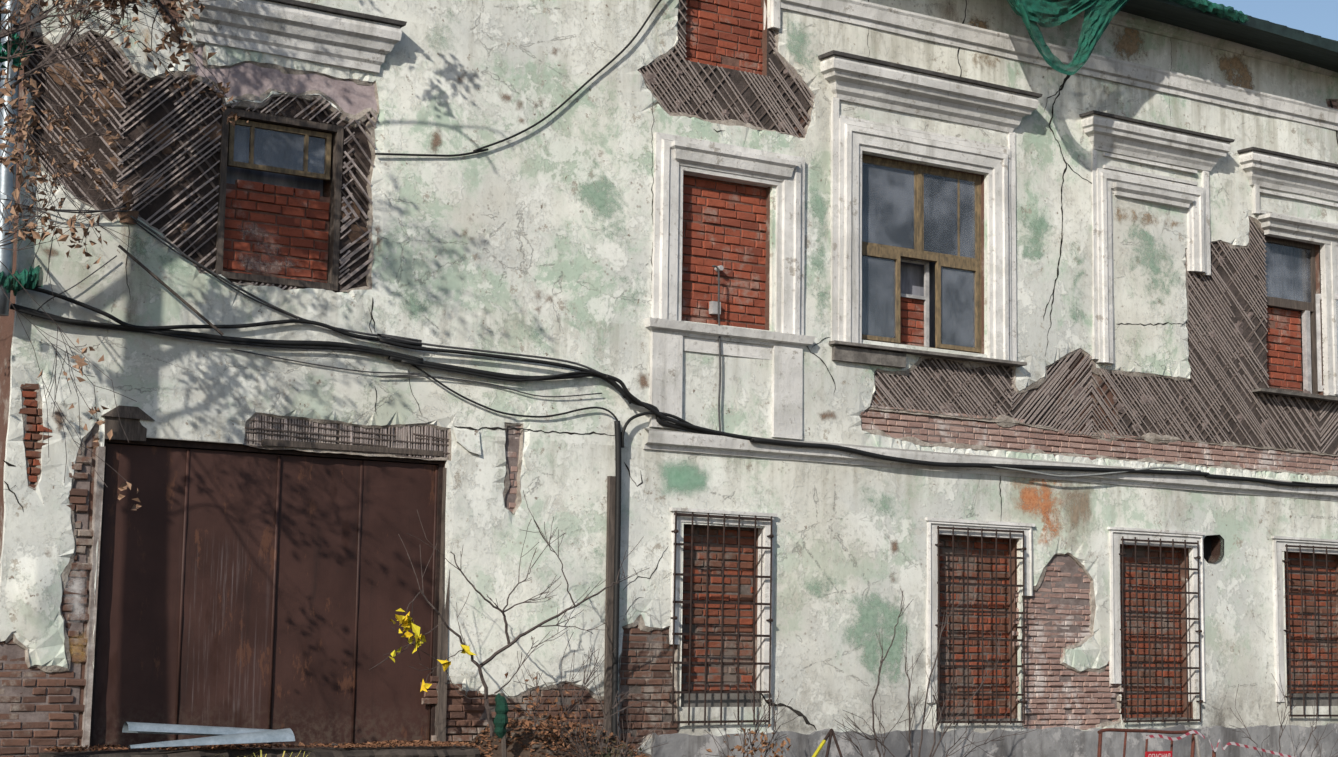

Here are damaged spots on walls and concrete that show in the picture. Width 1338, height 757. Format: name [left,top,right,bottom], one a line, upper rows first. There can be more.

flaking render [637,0,815,139]
flaking render [23,30,380,293]
crack [1043,75,1092,355]
flaking render [860,216,1338,476]
flaking render [19,383,62,490]
flaking render [503,422,524,514]
water stain [663,465,705,492]
rust [1020,478,1059,542]
flaking render [0,421,97,757]
flaking render [420,615,688,751]
water stain [847,594,906,682]
flaking render [1012,552,1125,730]